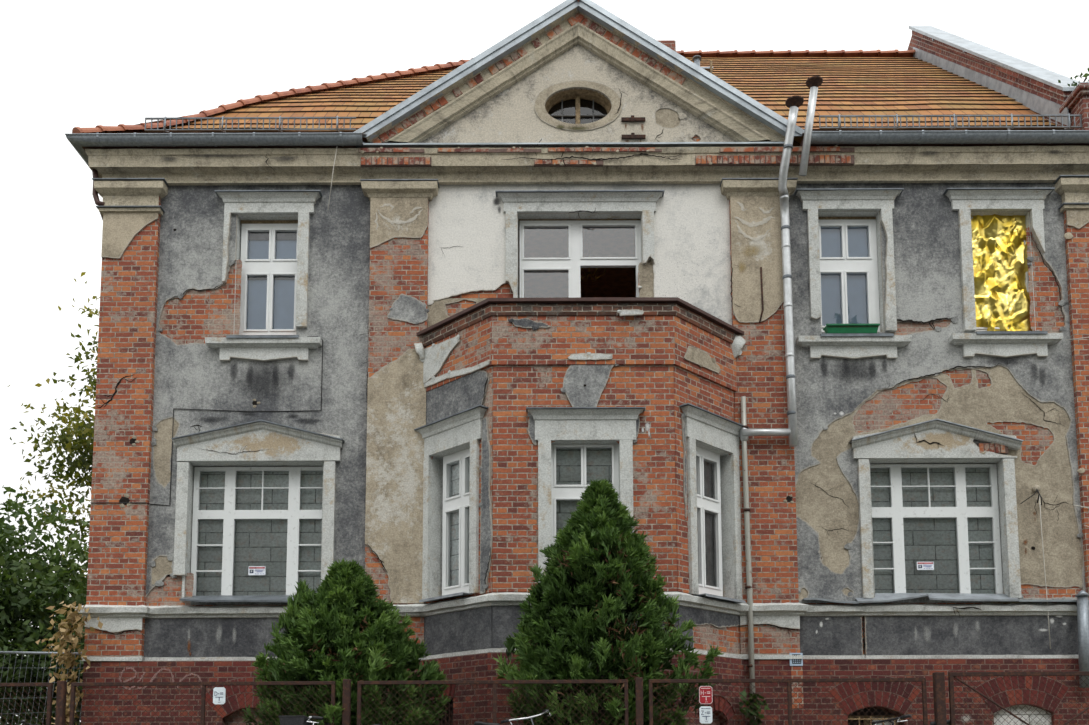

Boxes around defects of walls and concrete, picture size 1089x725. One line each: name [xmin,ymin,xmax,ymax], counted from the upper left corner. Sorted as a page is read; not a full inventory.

flaking render [655,109,701,142]
flaking render [695,145,855,166]
flaking render [368,227,490,424]
crack [98,375,134,408]
flaking render [84,219,242,656]
water stain [231,367,293,391]
peeling [561,352,619,407]
peeling [684,346,720,374]
flaking render [733,222,1089,602]
peeling [479,417,493,594]
flaking render [365,544,391,603]
flaking render [693,615,800,655]